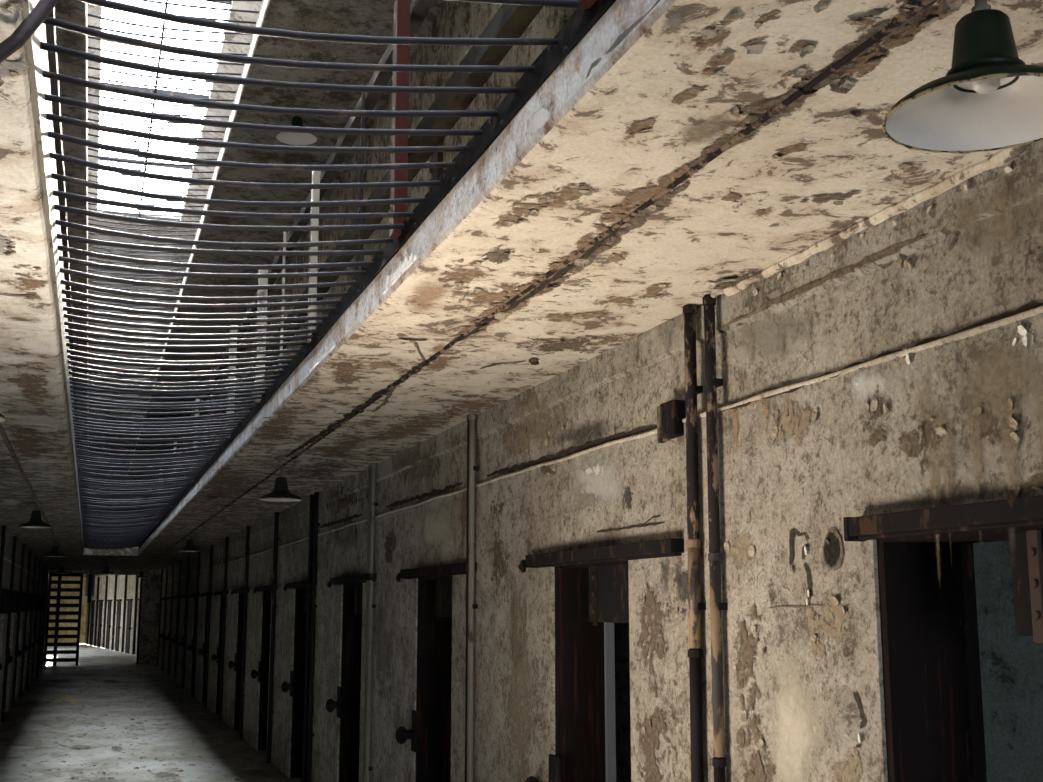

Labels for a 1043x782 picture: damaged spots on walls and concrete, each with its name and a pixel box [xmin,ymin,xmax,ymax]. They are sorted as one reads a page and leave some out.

crack [586,0,660,78]
spalling [421,0,969,373]
flaking render [703,146,1025,298]
peeling [0,236,49,300]
peeling [382,251,417,294]
crack [716,235,926,335]
peeling [308,335,398,386]
crack [286,339,453,458]
crack [721,302,1043,412]
crack [487,425,657,476]
water stain [662,564,680,593]
crack [789,529,811,605]